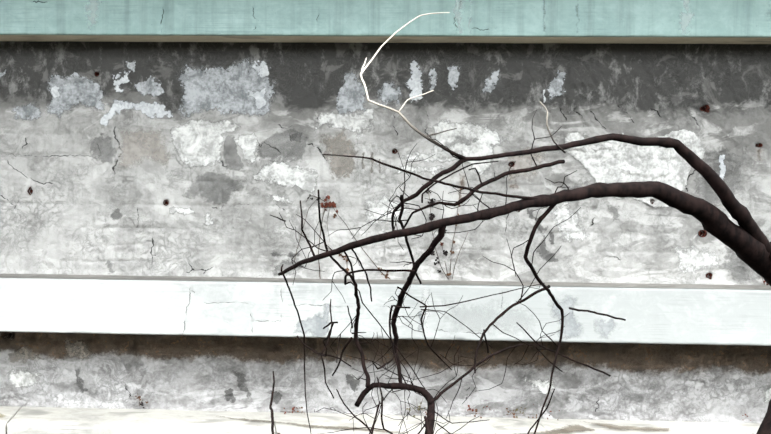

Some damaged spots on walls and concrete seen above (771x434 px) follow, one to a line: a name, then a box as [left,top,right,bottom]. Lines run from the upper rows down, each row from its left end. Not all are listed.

water stain [406,60,460,101]
water stain [543,70,566,103]
peeling [12,59,318,195]